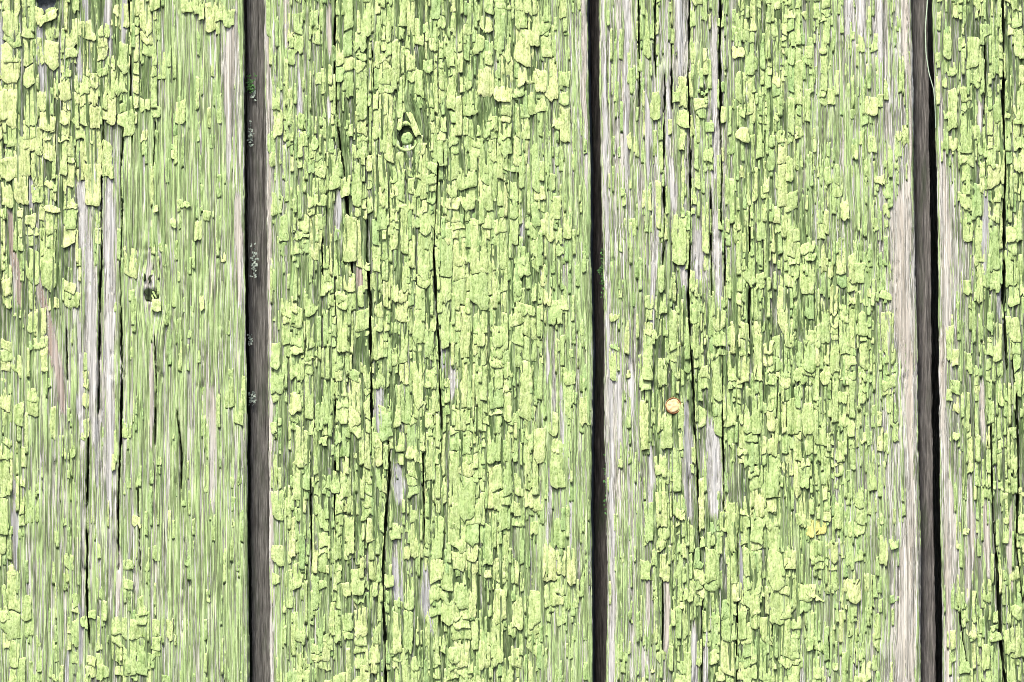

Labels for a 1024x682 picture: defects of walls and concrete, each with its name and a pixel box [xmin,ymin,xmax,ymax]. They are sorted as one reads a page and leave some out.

peeling [0,0,182,682]
peeling [194,210,211,241]
peeling [181,0,238,145]
peeling [209,368,245,511]
peeling [221,193,243,308]
crack [321,0,391,682]
peeling [265,0,588,682]
crack [422,166,443,545]
crack [638,0,750,539]
peeling [601,0,918,682]
peeling [935,0,1024,682]
crack [984,0,1023,682]